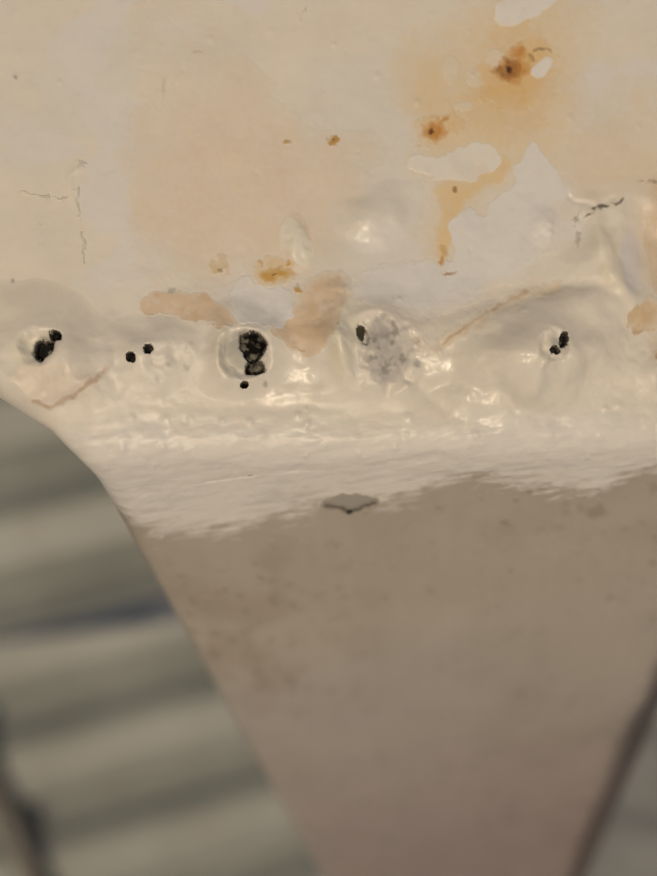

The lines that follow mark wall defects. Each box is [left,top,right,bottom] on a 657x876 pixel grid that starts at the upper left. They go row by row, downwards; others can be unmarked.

peeling [493,0,558,27]
corrosion [476,35,556,123]
corrosion [413,108,466,153]
peeling [139,140,574,386]
peeling [320,493,380,516]